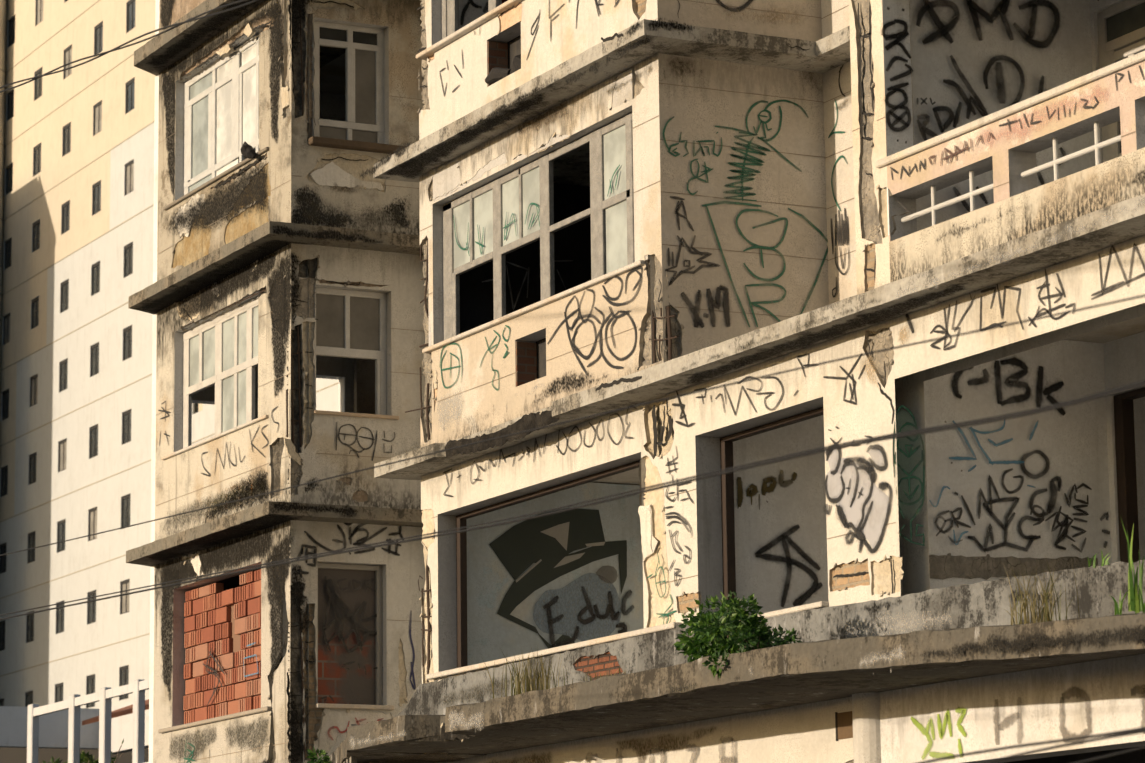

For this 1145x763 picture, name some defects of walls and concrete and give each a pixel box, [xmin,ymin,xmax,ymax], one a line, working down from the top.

water stain [146,0,316,235]
flaking render [305,153,386,192]
water stain [360,18,695,179]
spalling [851,0,909,292]
water stain [139,187,408,396]
spalling [863,327,894,388]
water stain [146,471,357,701]
spalling [829,555,904,597]
spalling [573,651,624,680]
water stain [865,624,1145,664]
water stain [170,719,269,763]
water stain [287,683,310,762]